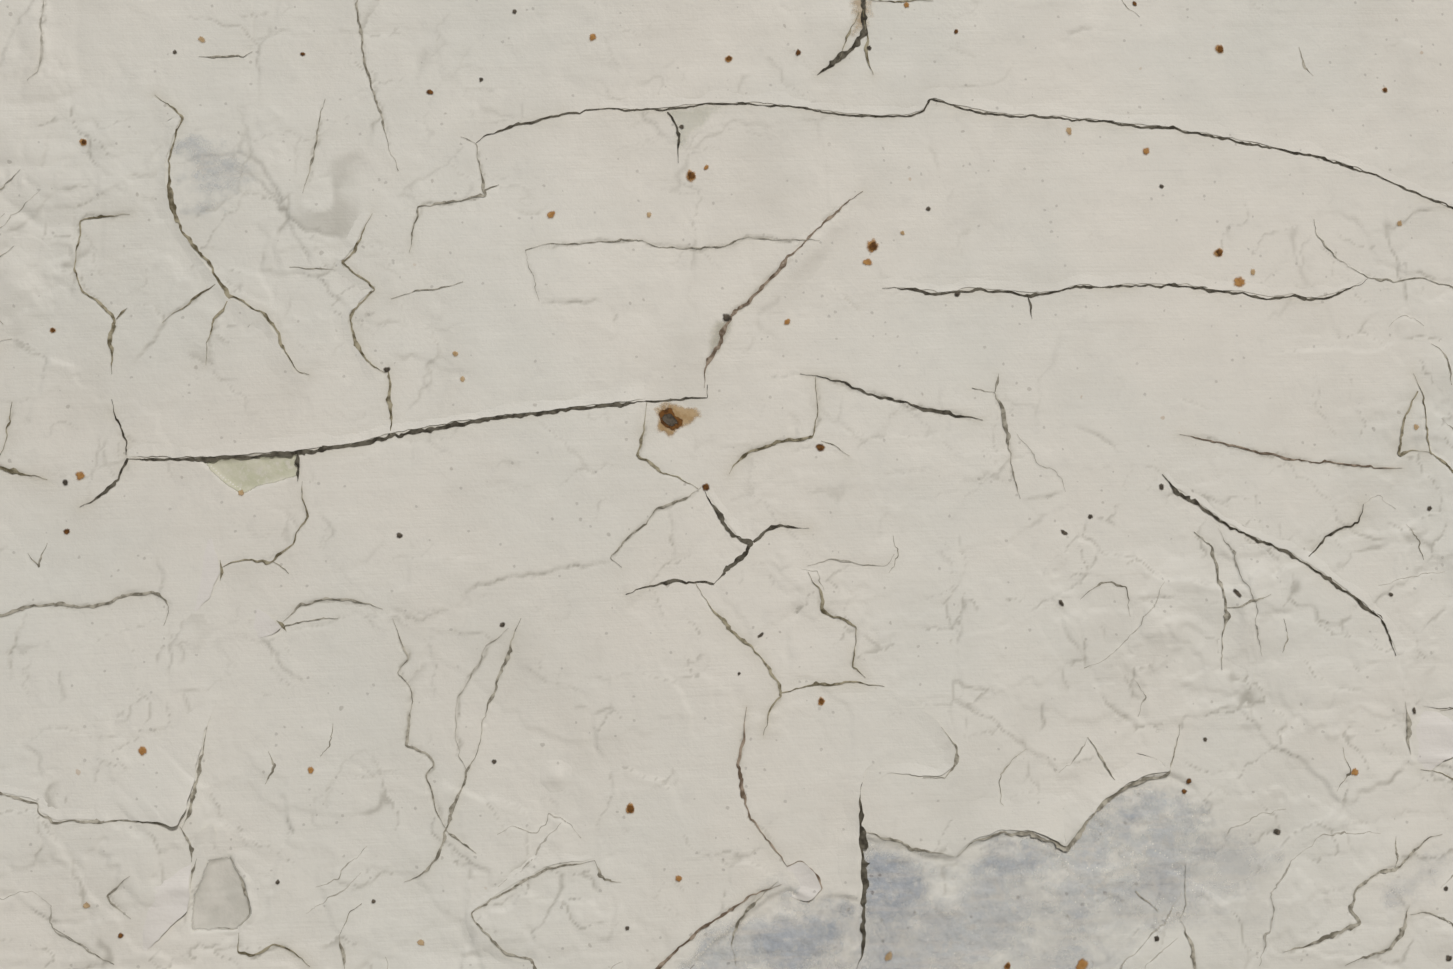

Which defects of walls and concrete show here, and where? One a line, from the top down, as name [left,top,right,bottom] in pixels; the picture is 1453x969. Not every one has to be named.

crack [355,0,399,171]
crack [409,0,1453,252]
crack [882,221,1453,316]
crack [0,403,47,480]
crack [0,591,169,626]
peeling [205,454,297,493]
crack [73,95,1021,969]
rust [658,404,698,436]
crack [1162,471,1407,663]
crack [1180,373,1453,473]
peeling [835,687,959,967]
crack [1285,834,1453,966]